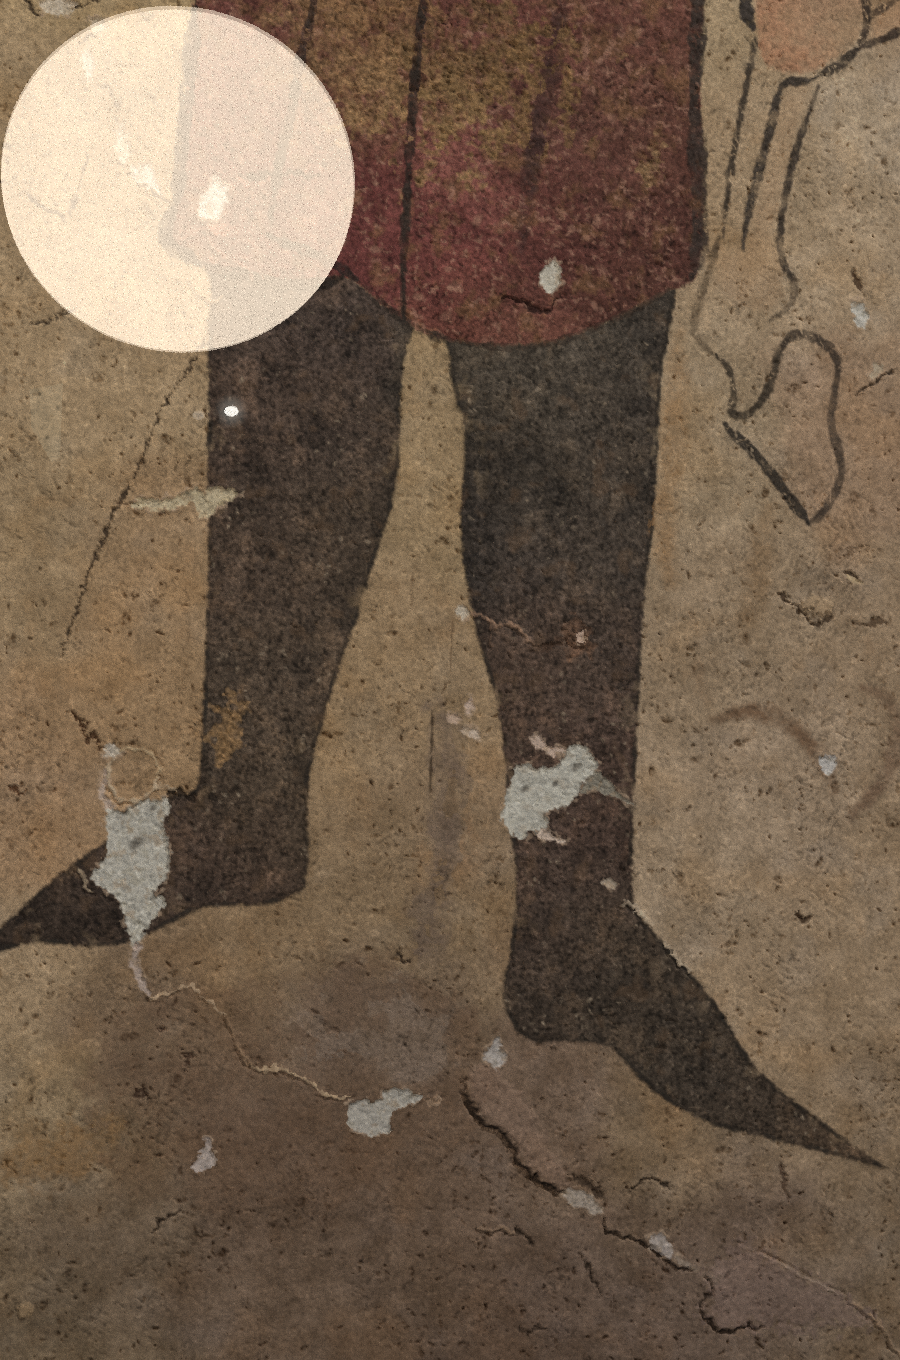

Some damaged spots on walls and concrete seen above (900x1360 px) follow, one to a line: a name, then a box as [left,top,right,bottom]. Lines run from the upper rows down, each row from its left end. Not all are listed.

crack [93,79,179,215]
spalling [537,256,566,296]
crack [60,304,216,660]
spalling [113,481,245,522]
spalling [65,709,197,951]
spalling [497,731,635,846]
crack [126,941,351,1101]
spalling [190,1135,218,1175]
spalling [343,1086,442,1138]
crack [558,1173,701,1299]
crack [778,1161,791,1204]
crack [513,1323,550,1337]